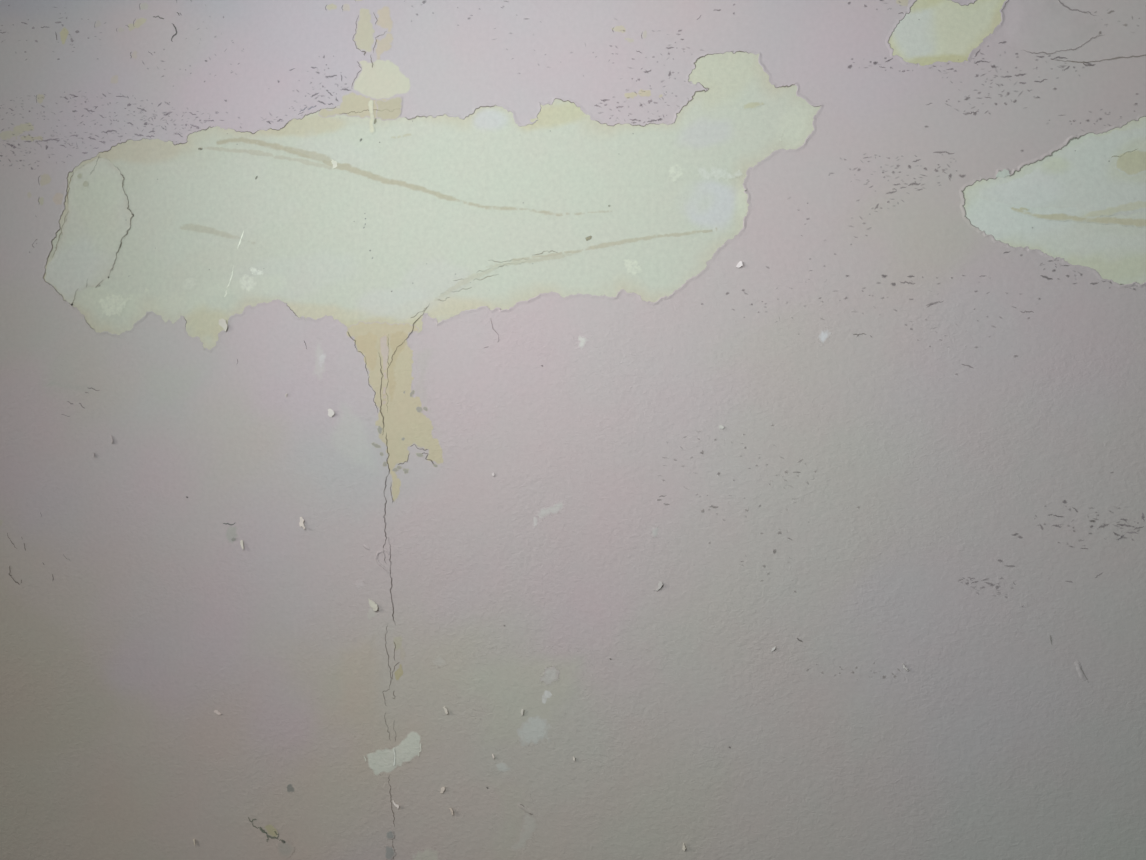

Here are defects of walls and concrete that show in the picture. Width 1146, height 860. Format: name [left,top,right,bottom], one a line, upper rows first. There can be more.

peeling [874,0,1010,77]
peeling [41,48,824,353]
peeling [897,103,1146,289]
crack [362,303,430,860]